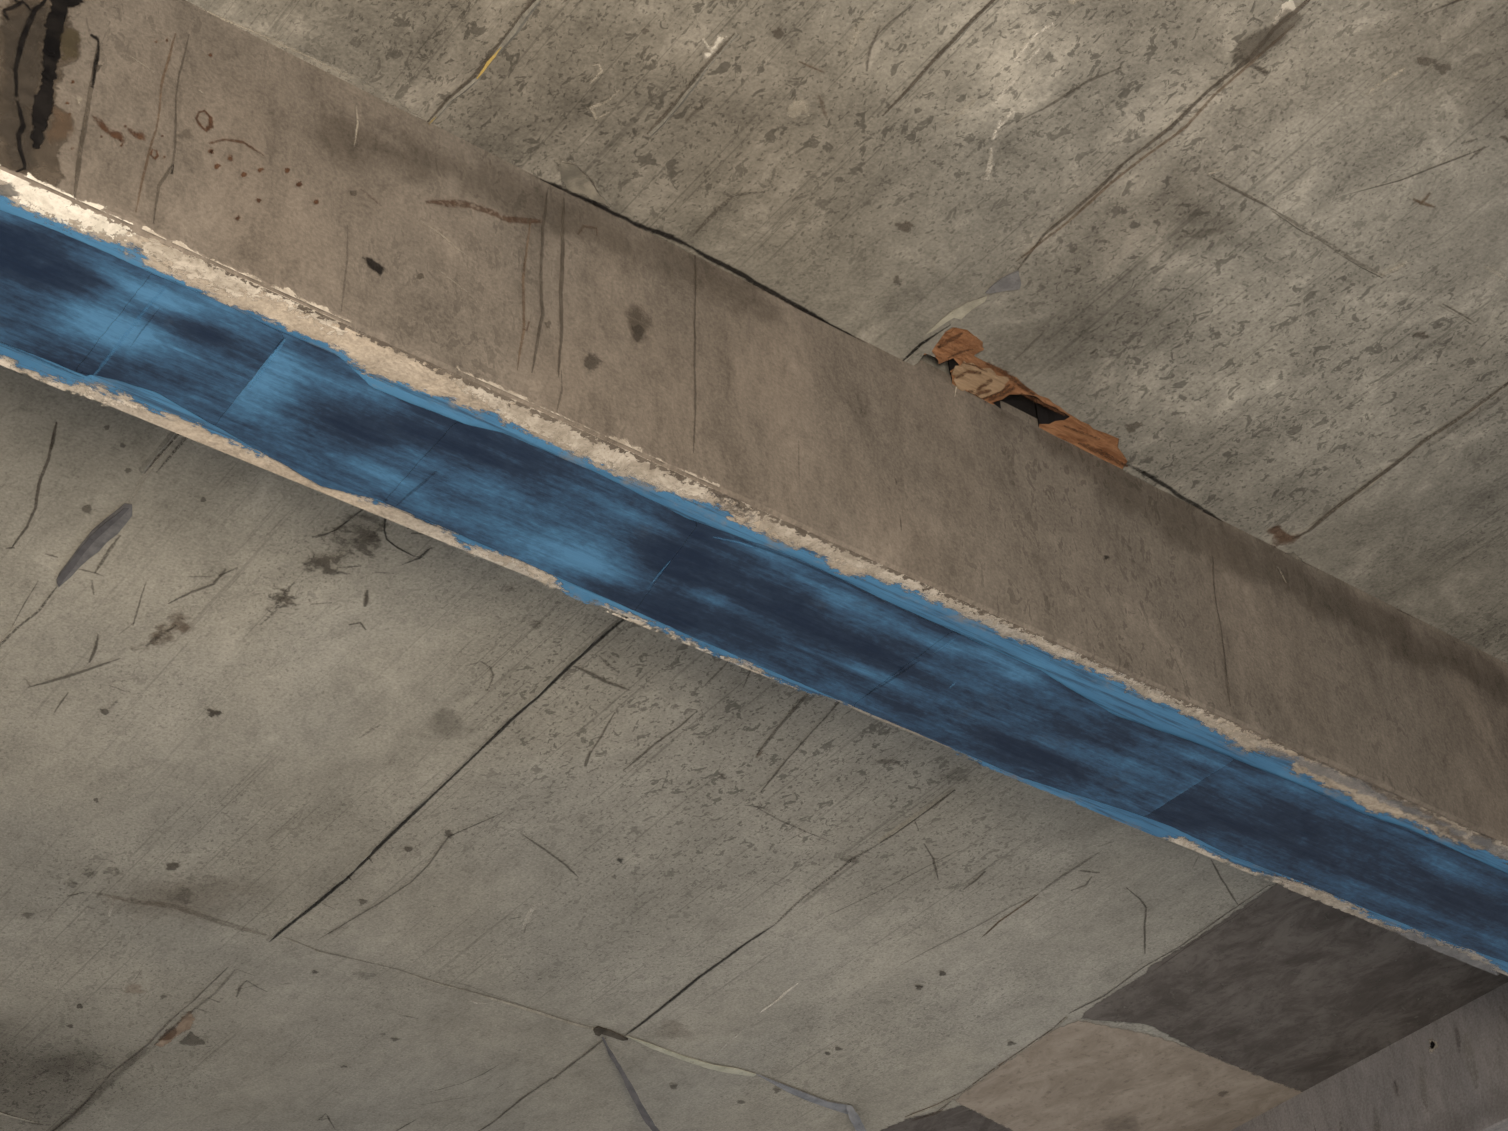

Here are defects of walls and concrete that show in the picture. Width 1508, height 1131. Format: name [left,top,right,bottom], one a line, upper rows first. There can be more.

spalling [0,169,1508,974]